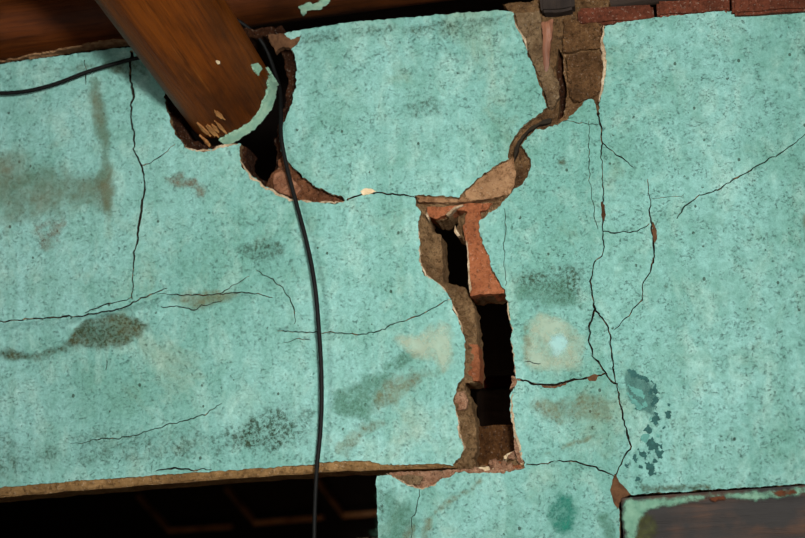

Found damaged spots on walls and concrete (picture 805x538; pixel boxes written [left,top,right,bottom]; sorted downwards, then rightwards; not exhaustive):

crack [0,52,452,343]
spalling [168,25,345,204]
spalling [386,0,611,489]
crack [501,209,509,286]
crack [517,113,805,479]
peeling [625,369,671,481]
peeling [610,475,805,538]